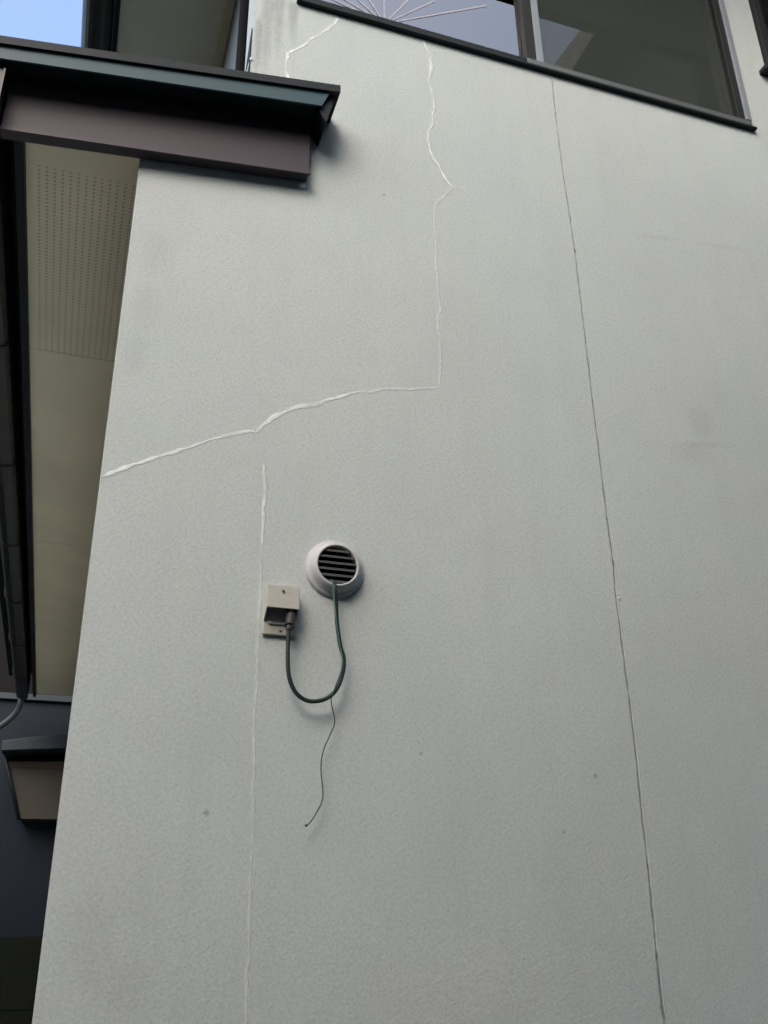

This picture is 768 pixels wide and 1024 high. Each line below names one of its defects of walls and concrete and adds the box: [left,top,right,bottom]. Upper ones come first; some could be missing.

crack [101,40,463,477]
crack [284,17,339,78]
crack [244,465,267,1024]